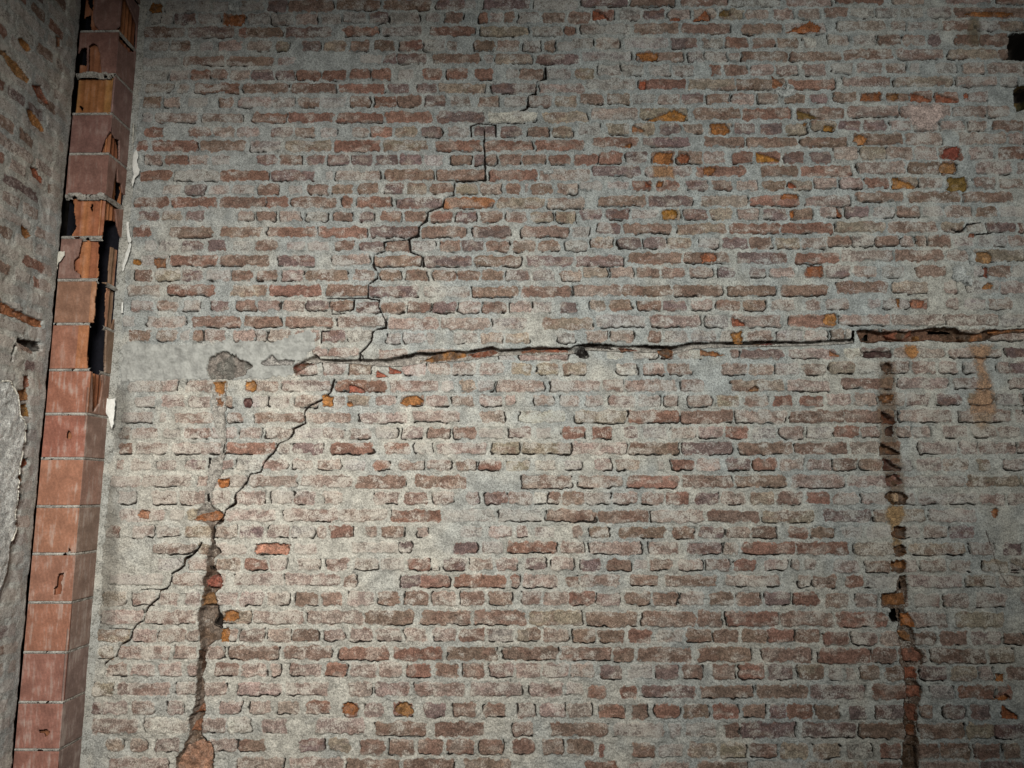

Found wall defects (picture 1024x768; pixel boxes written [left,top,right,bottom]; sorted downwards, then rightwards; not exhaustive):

hole [1006,33,1024,62]
hole [1013,86,1024,112]
peeling [131,123,140,186]
crack [321,68,547,362]
crack [951,223,989,236]
flaking render [207,351,314,408]
crack [103,379,335,679]